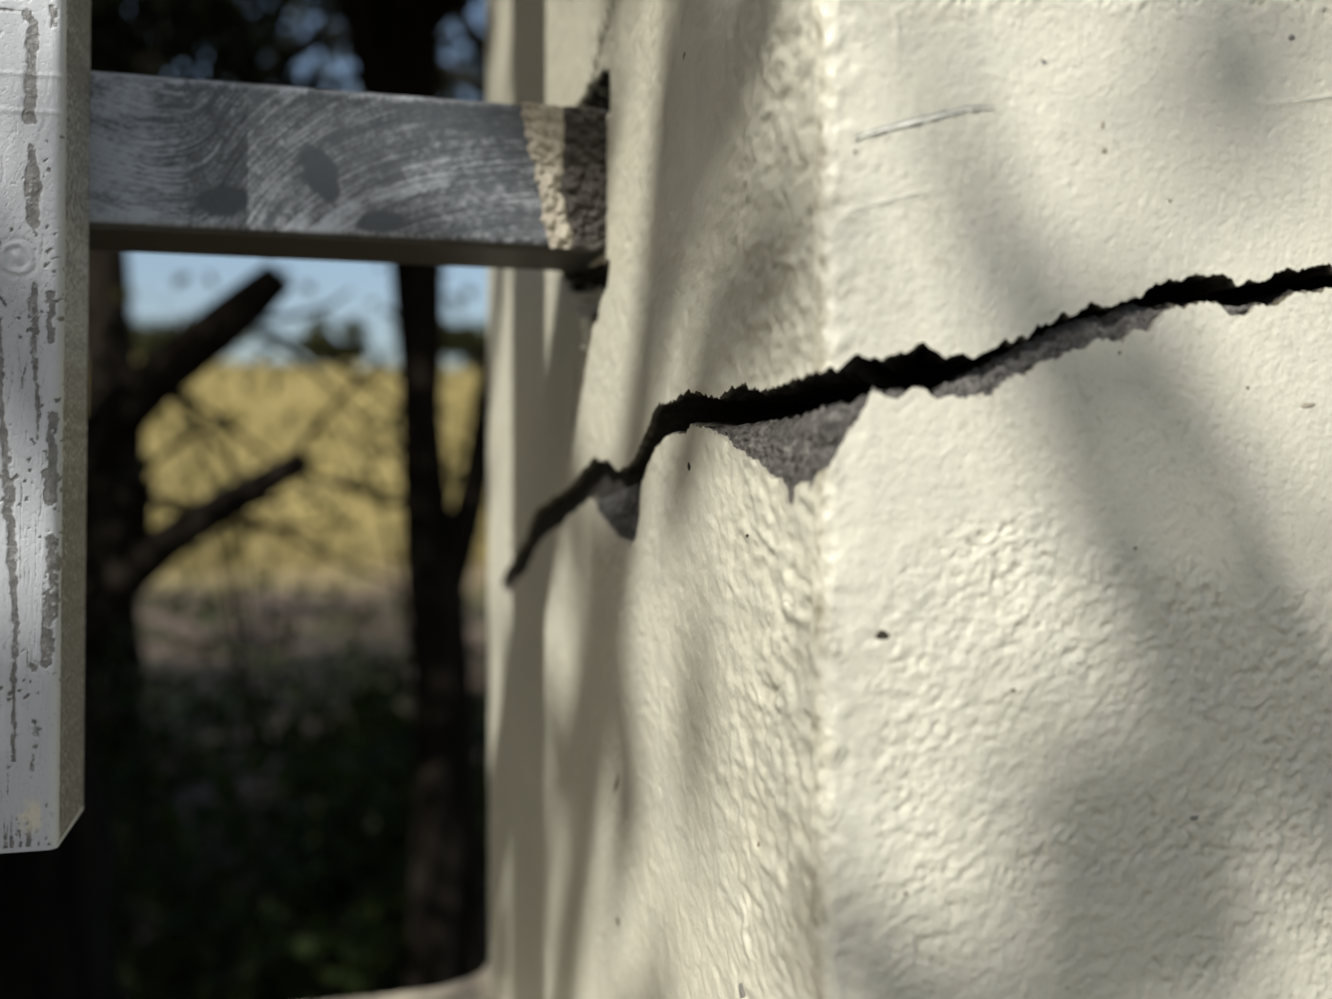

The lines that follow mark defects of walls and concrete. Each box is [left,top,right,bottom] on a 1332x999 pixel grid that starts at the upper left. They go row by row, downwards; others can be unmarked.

crack [502,263,1332,595]